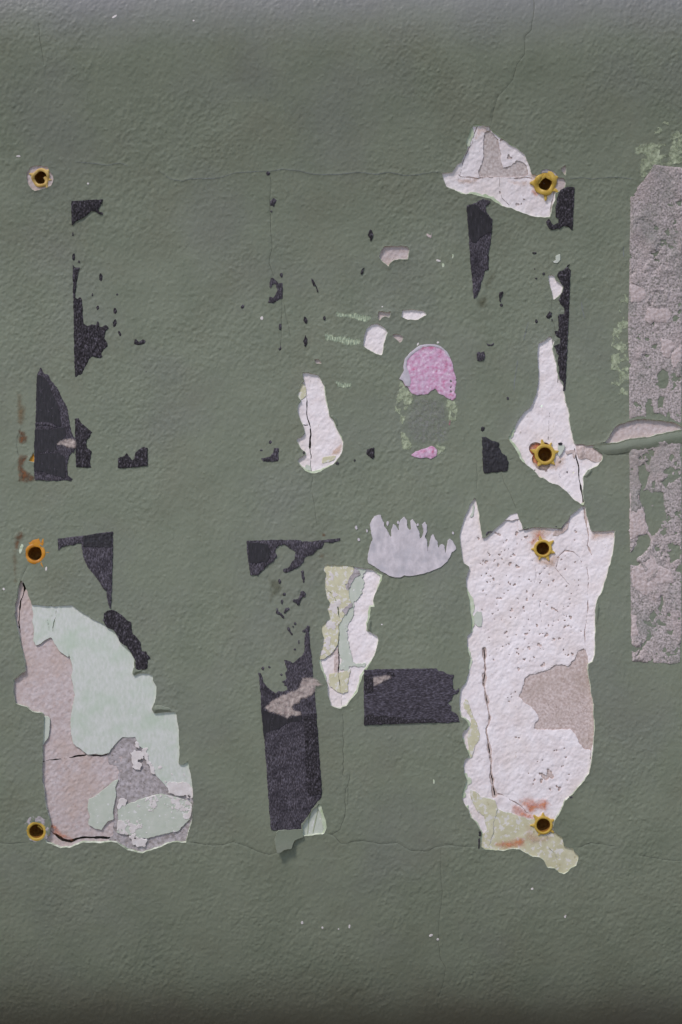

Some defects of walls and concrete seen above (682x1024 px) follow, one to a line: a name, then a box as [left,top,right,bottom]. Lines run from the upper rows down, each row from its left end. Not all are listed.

peeling [442,124,566,217]
peeling [297,359,343,473]
peeling [319,565,382,708]
peeling [459,337,682,873]
peeling [14,581,193,852]
peeling [303,804,327,835]